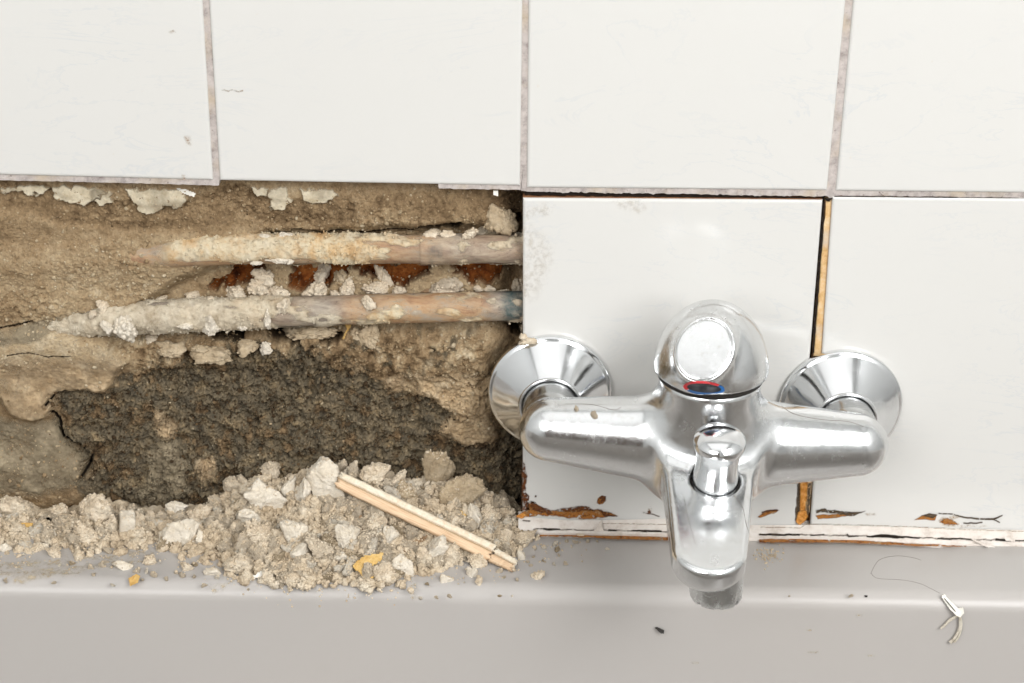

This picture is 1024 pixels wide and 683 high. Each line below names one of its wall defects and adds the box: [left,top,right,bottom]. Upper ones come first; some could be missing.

rust [209,264,265,288]
rust [289,263,429,289]
rust [455,263,503,283]
spalling [0,180,527,519]
crack [45,391,94,478]
water stain [0,337,522,508]
rust [795,482,865,525]
rust [915,513,1003,525]